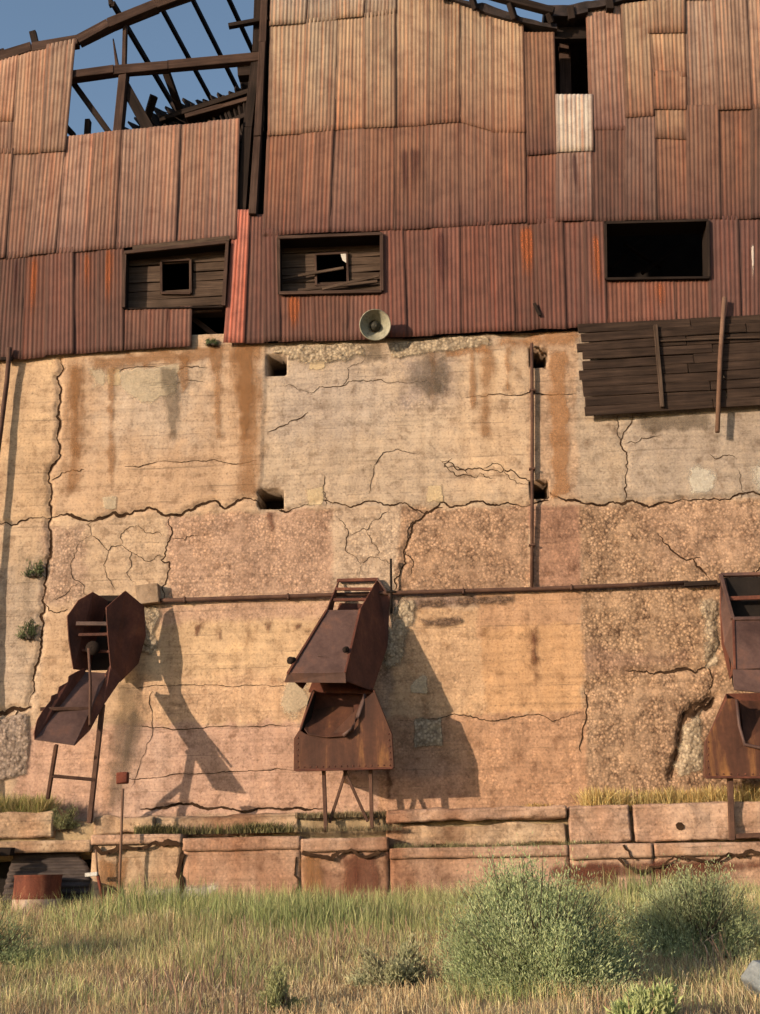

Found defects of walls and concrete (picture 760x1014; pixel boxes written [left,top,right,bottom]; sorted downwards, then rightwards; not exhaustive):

corrosion [521,229,532,265]
corrosion [289,297,299,322]
spalling [273,342,364,363]
spalling [390,335,490,358]
crack [279,415,760,591]
crack [0,360,257,716]
spalling [383,599,463,669]
crack [625,620,720,778]
spalling [0,713,29,780]
spalling [674,716,702,776]
crack [140,802,323,813]
crack [93,839,185,895]